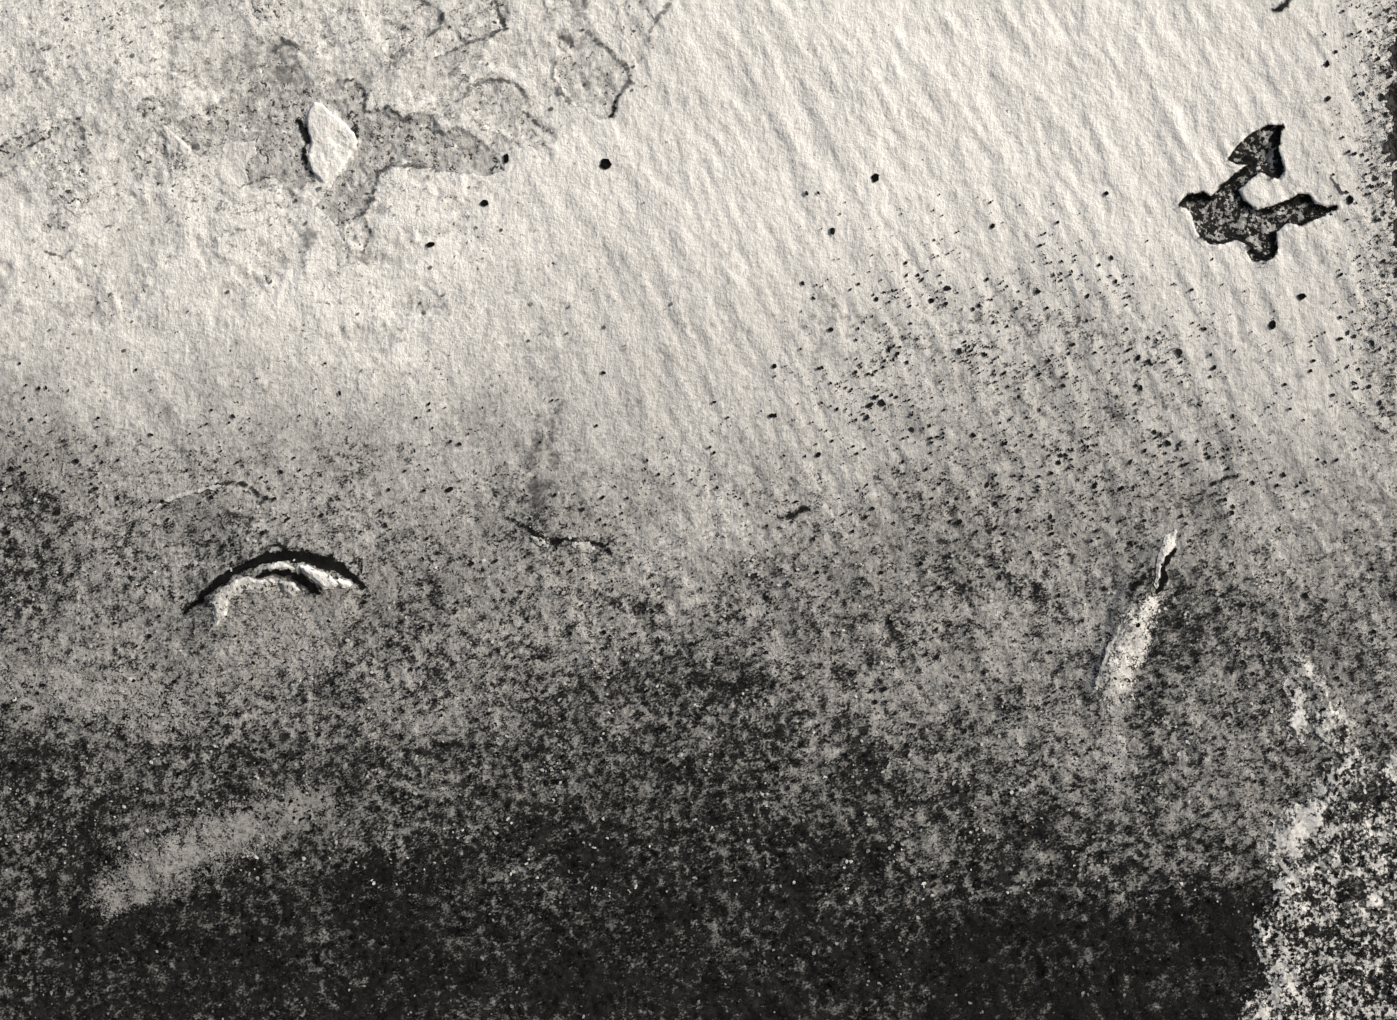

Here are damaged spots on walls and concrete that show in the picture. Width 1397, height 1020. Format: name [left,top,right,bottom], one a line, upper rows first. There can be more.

spalling [1171,118,1346,267]
leakage [1330,1,1397,491]
spalling [1365,9,1397,247]
crack [153,480,384,626]
leakage [0,232,1397,1020]